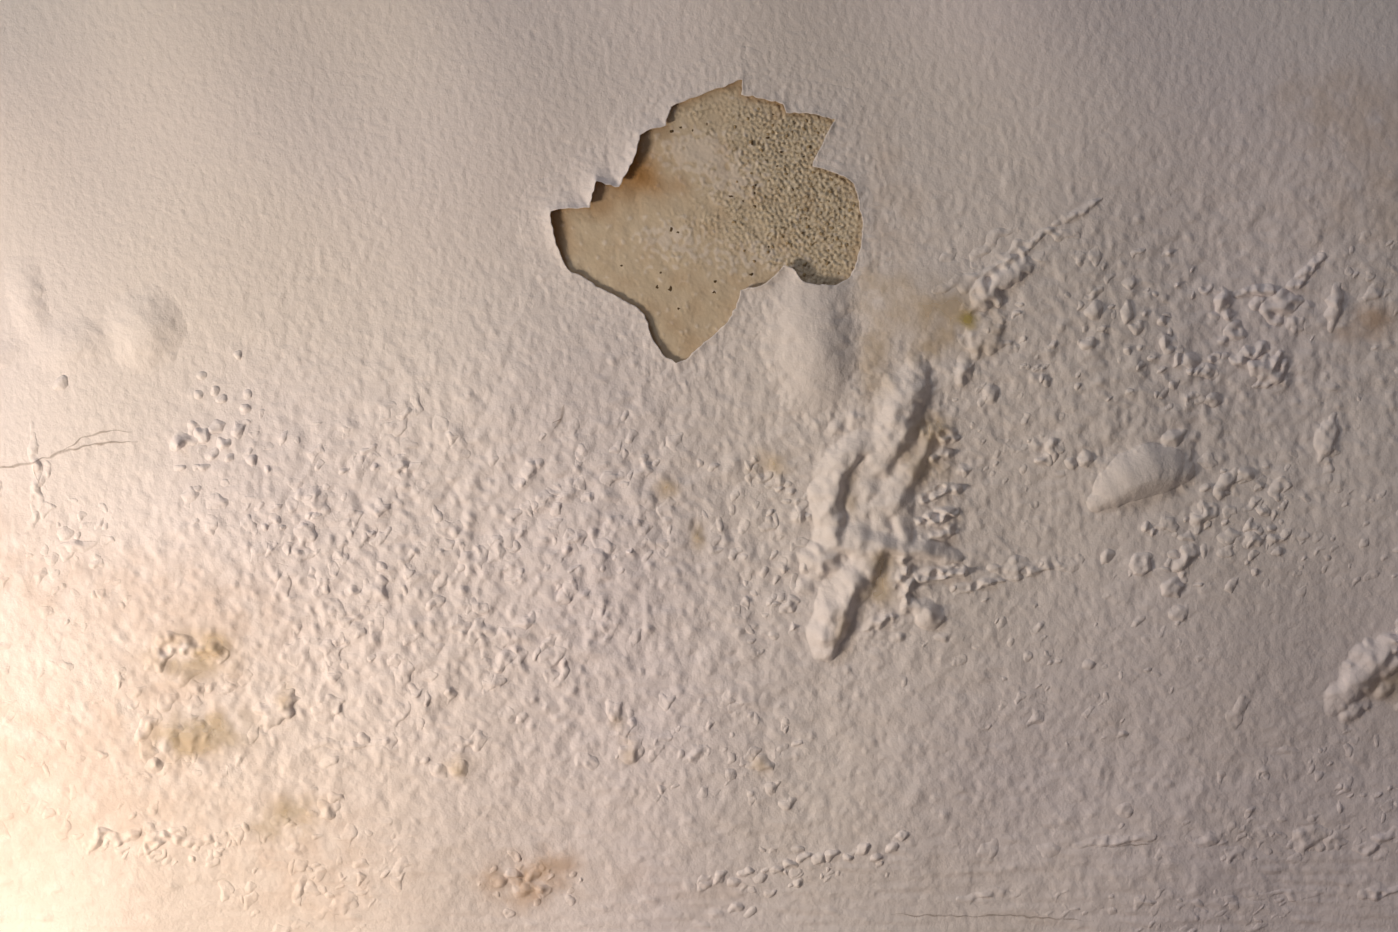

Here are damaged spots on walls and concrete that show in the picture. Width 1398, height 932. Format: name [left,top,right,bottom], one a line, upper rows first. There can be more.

peeling [518,46,896,395]